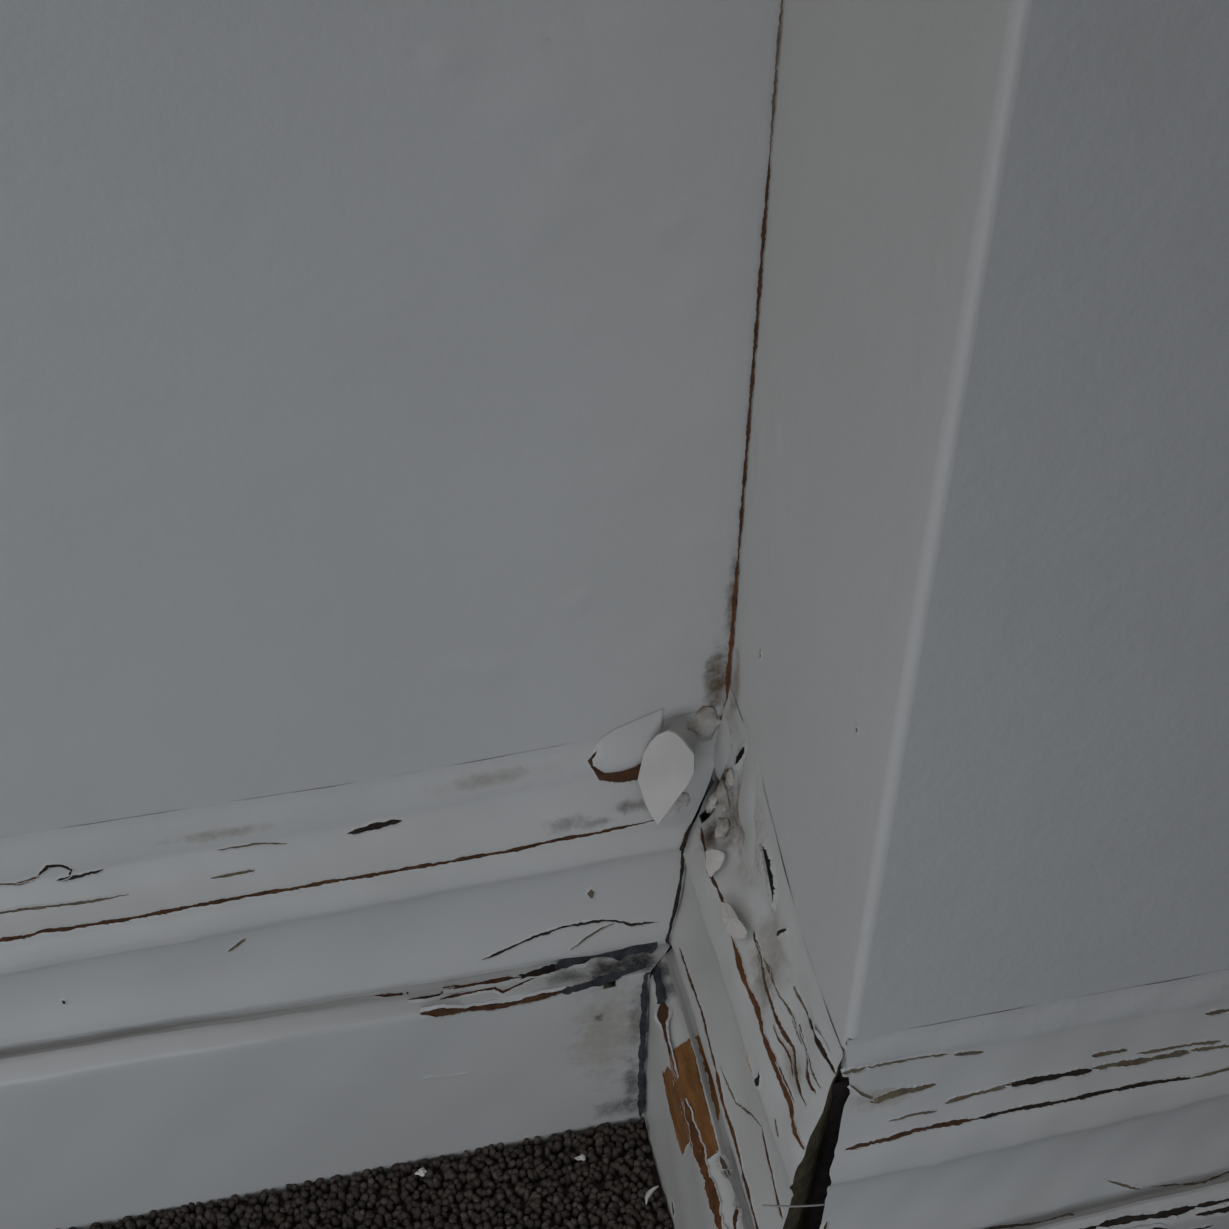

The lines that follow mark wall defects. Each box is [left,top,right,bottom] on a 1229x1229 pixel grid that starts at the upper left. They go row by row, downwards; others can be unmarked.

crack [0,816,656,944]
flaking render [584,699,776,939]
peeling [661,1035,724,1161]
peeling [753,1068,763,1090]
crack [374,824,1229,1229]